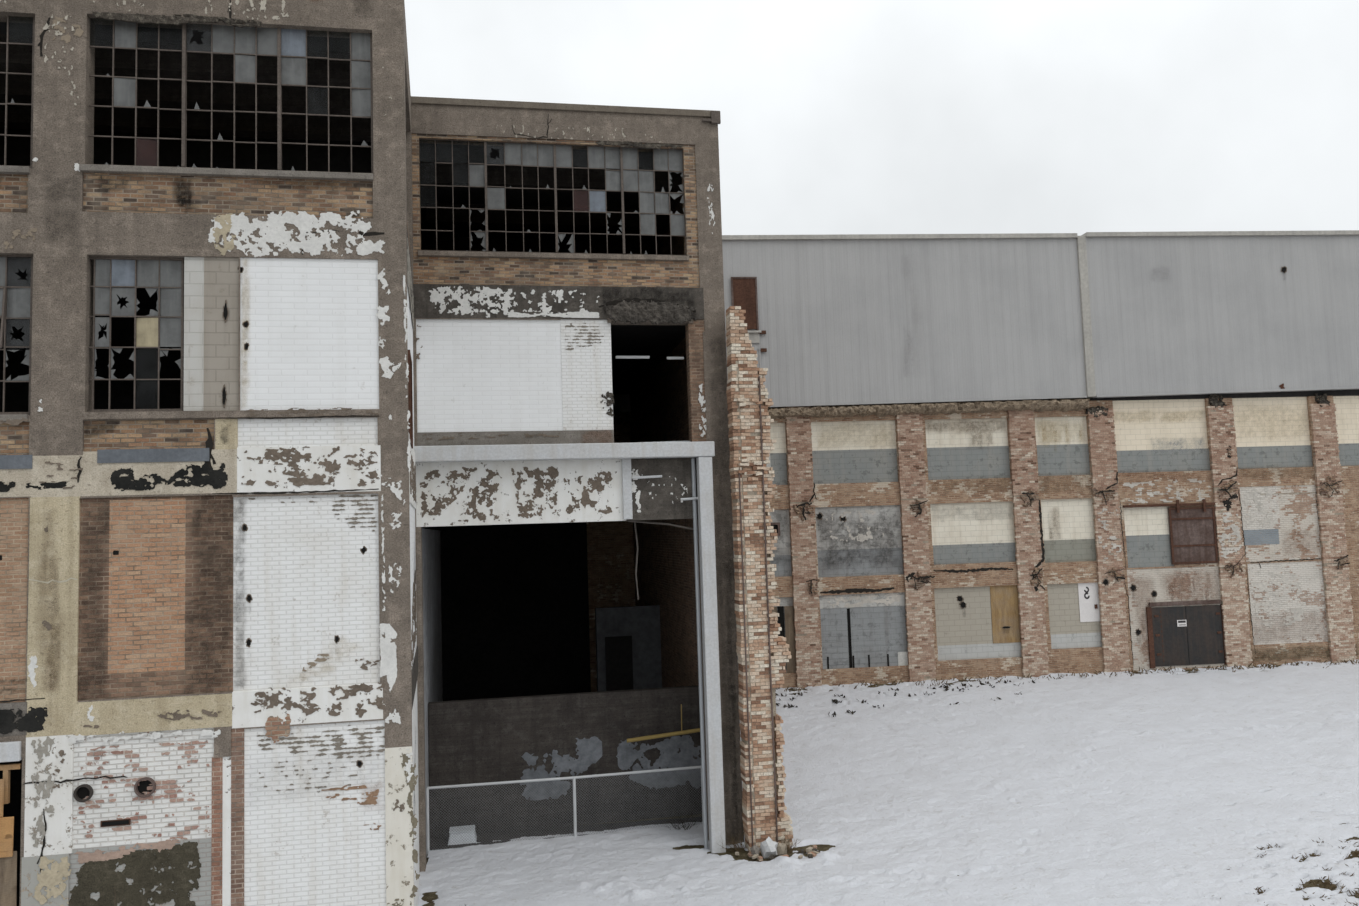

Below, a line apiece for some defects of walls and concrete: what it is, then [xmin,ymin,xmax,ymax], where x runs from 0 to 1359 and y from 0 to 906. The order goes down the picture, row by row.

peeling [40,461,83,489]
peeling [208,210,615,805]
peeling [631,469,688,513]
peeling [31,705,222,906]
peeling [387,749,420,906]
peeling [520,735,701,801]